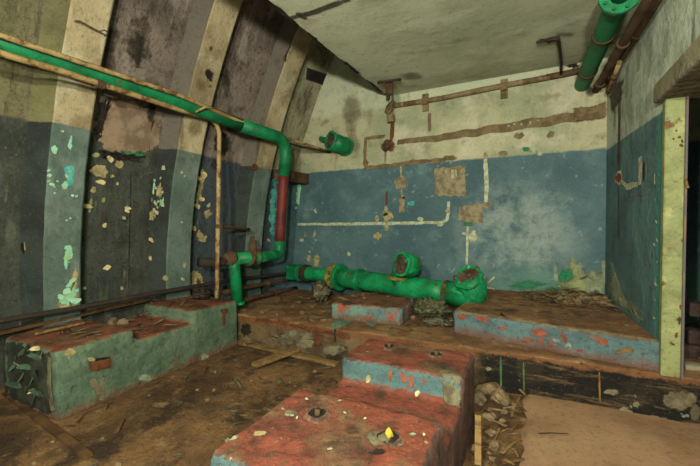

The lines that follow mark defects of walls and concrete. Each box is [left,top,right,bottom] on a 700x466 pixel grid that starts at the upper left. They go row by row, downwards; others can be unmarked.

damp [102,28,118,70]
damp [128,17,150,64]
damp [94,99,111,141]
damp [99,150,144,162]
flaking render [83,96,161,214]
peeling [47,165,78,198]
peeling [149,165,166,220]
flaking render [434,151,491,265]
peeling [511,258,608,305]
peeling [524,328,548,342]
peeling [389,370,426,396]
spalling [439,369,463,412]